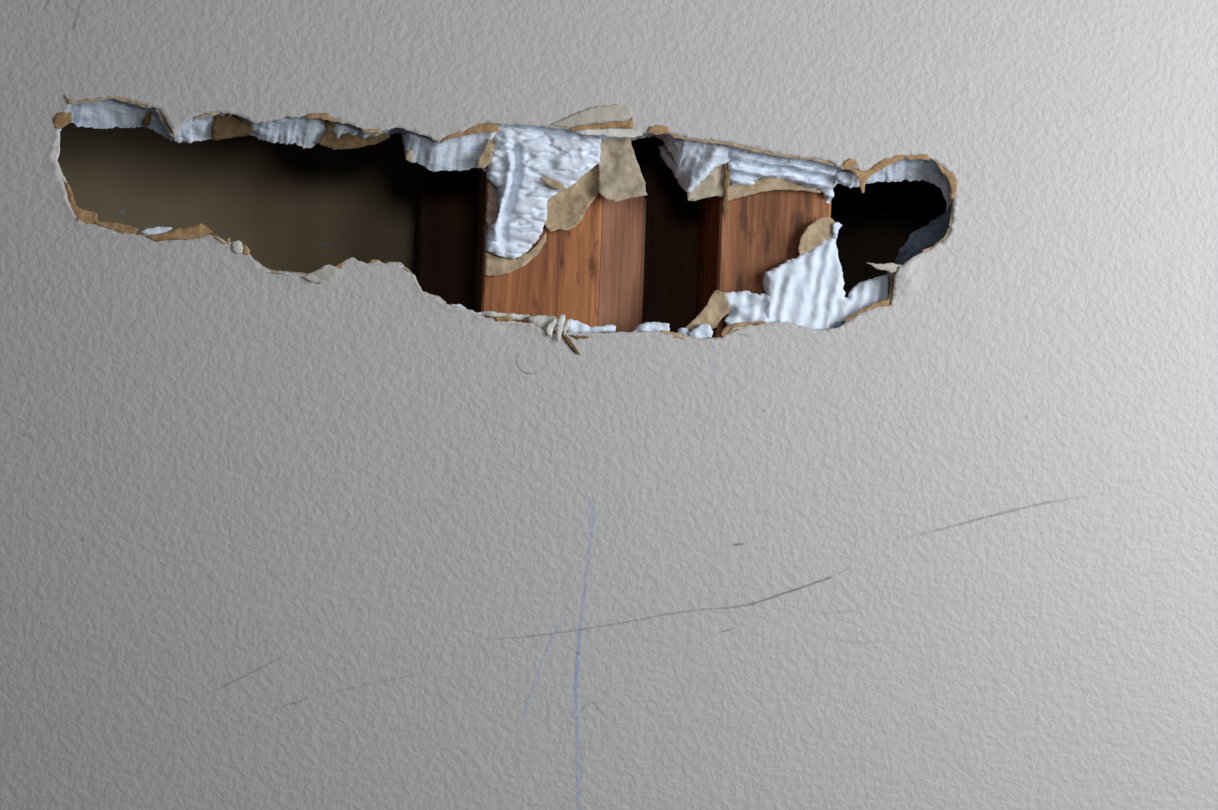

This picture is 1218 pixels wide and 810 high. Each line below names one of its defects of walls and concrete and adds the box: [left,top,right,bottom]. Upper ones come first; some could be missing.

spalling [368,259,616,355]
spalling [53,95,957,339]